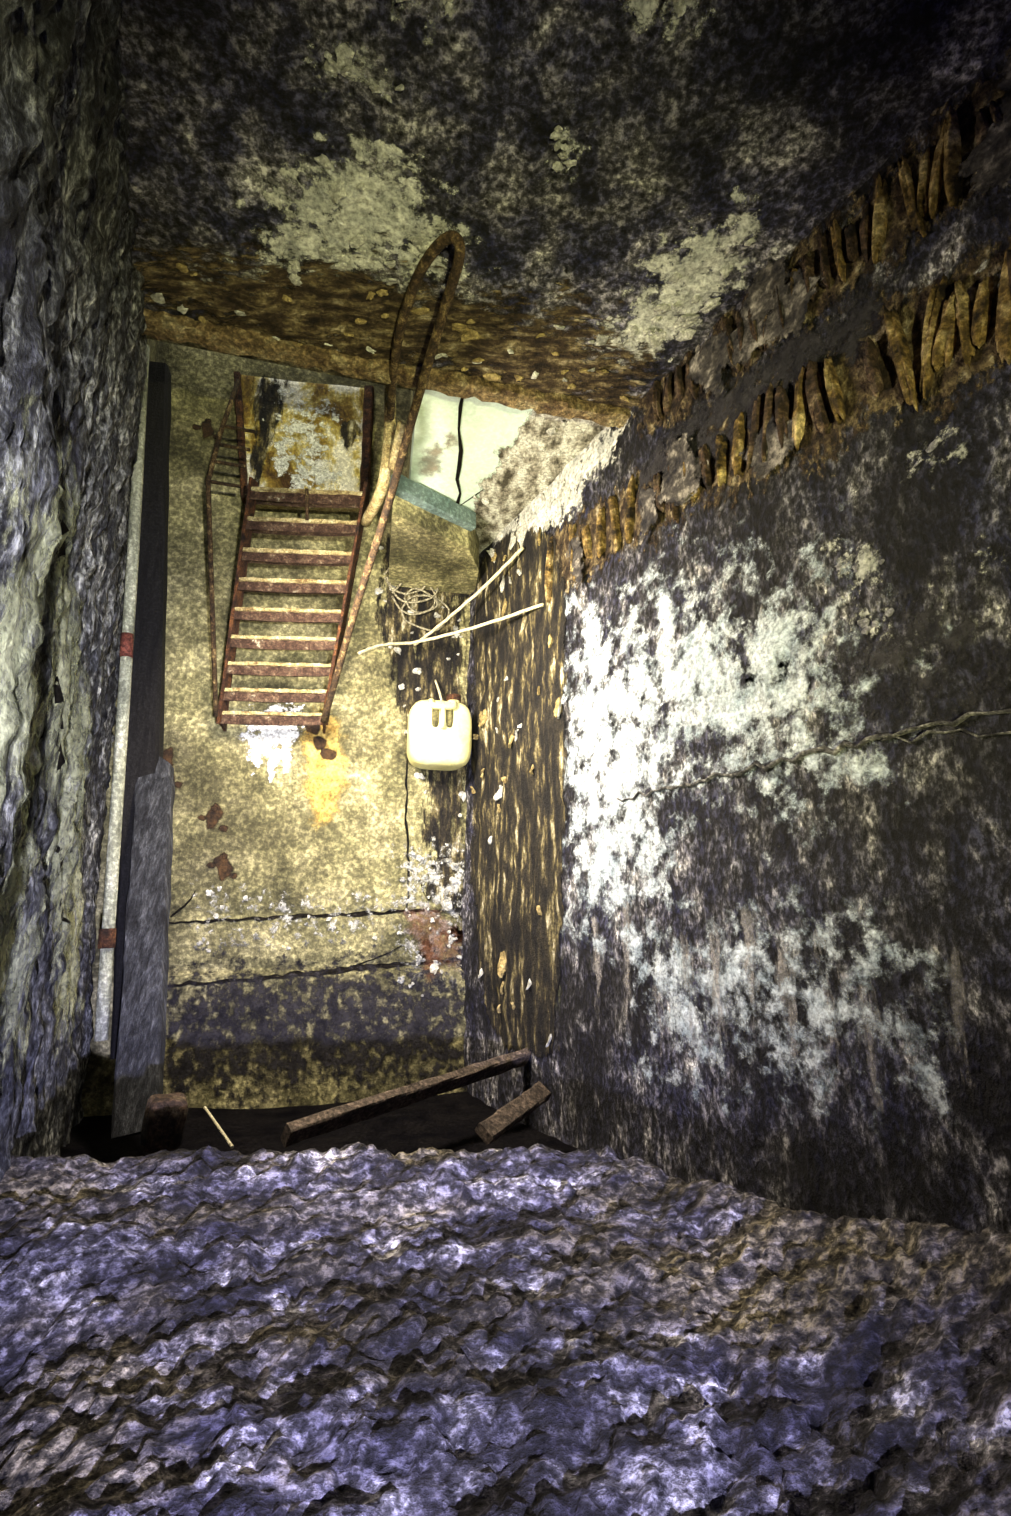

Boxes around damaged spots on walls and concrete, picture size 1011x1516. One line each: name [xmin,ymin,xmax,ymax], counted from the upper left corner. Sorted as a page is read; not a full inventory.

rust [300,709,348,822]
peeling [132,43,1011,1059]
damp [561,549,948,1113]
crack [616,709,1011,802]